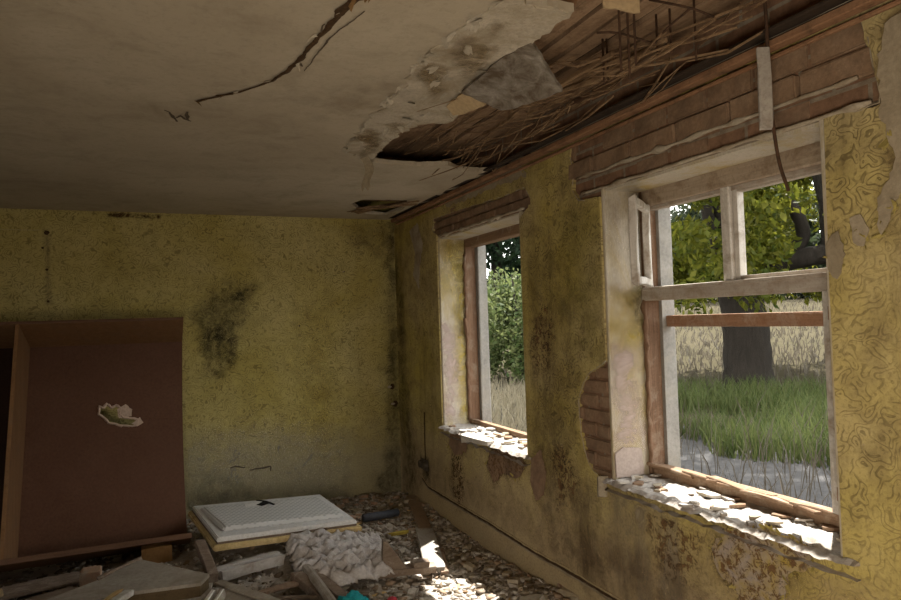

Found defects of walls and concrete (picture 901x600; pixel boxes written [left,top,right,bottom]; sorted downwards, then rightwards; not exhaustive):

crack [164,0,370,122]
peeling [340,0,572,159]
flaking render [434,189,530,236]
peeling [823,13,901,279]
spalling [484,444,579,505]
spalling [578,351,644,497]